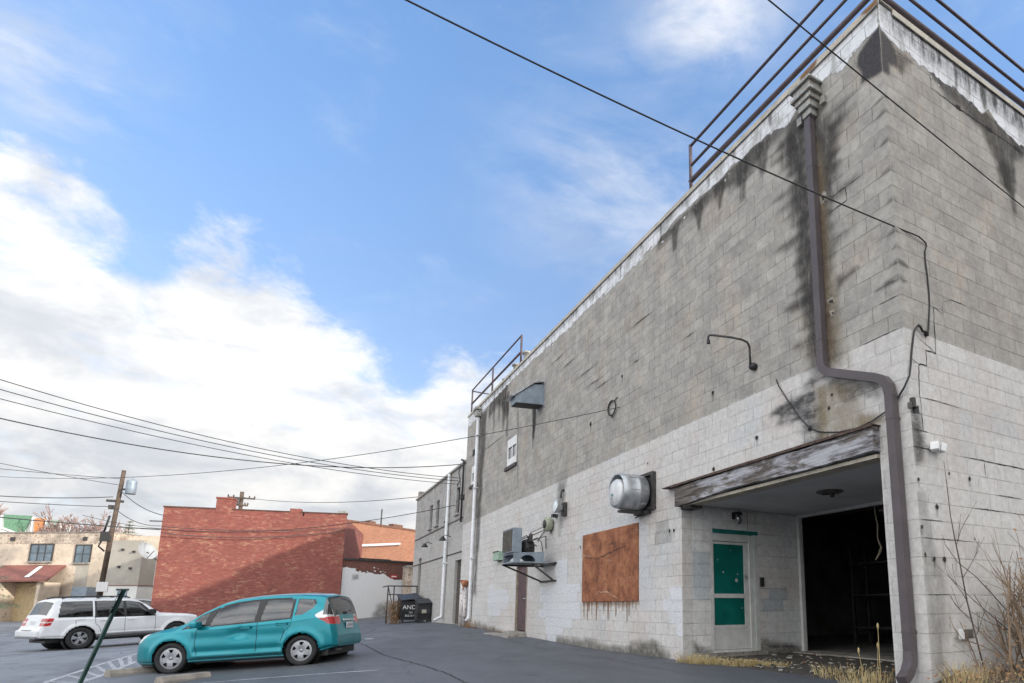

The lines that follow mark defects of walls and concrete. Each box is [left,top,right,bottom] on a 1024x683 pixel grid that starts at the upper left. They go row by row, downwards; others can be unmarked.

damp [858,22,1024,189]
damp [660,112,843,364]
crack [914,299,963,450]